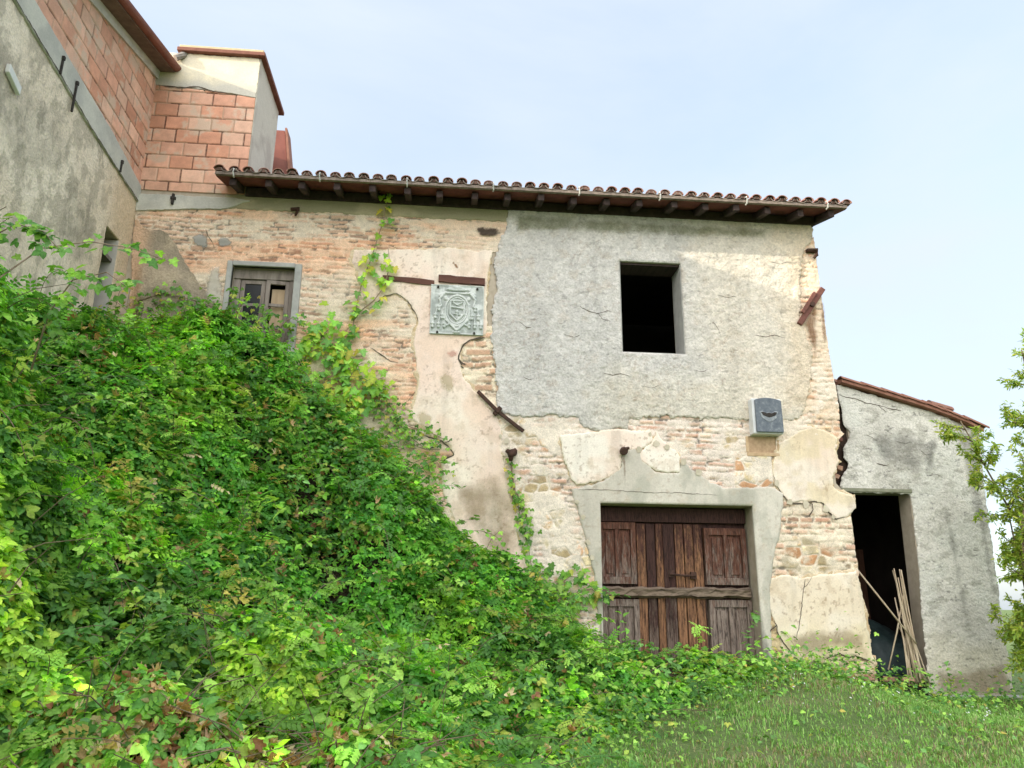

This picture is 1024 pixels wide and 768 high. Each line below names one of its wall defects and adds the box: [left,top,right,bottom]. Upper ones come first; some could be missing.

flaking render [135,208,507,521]
flaking render [460,326,603,643]
flaking render [615,237,859,579]
crack [770,577,812,651]
crack [774,390,901,520]